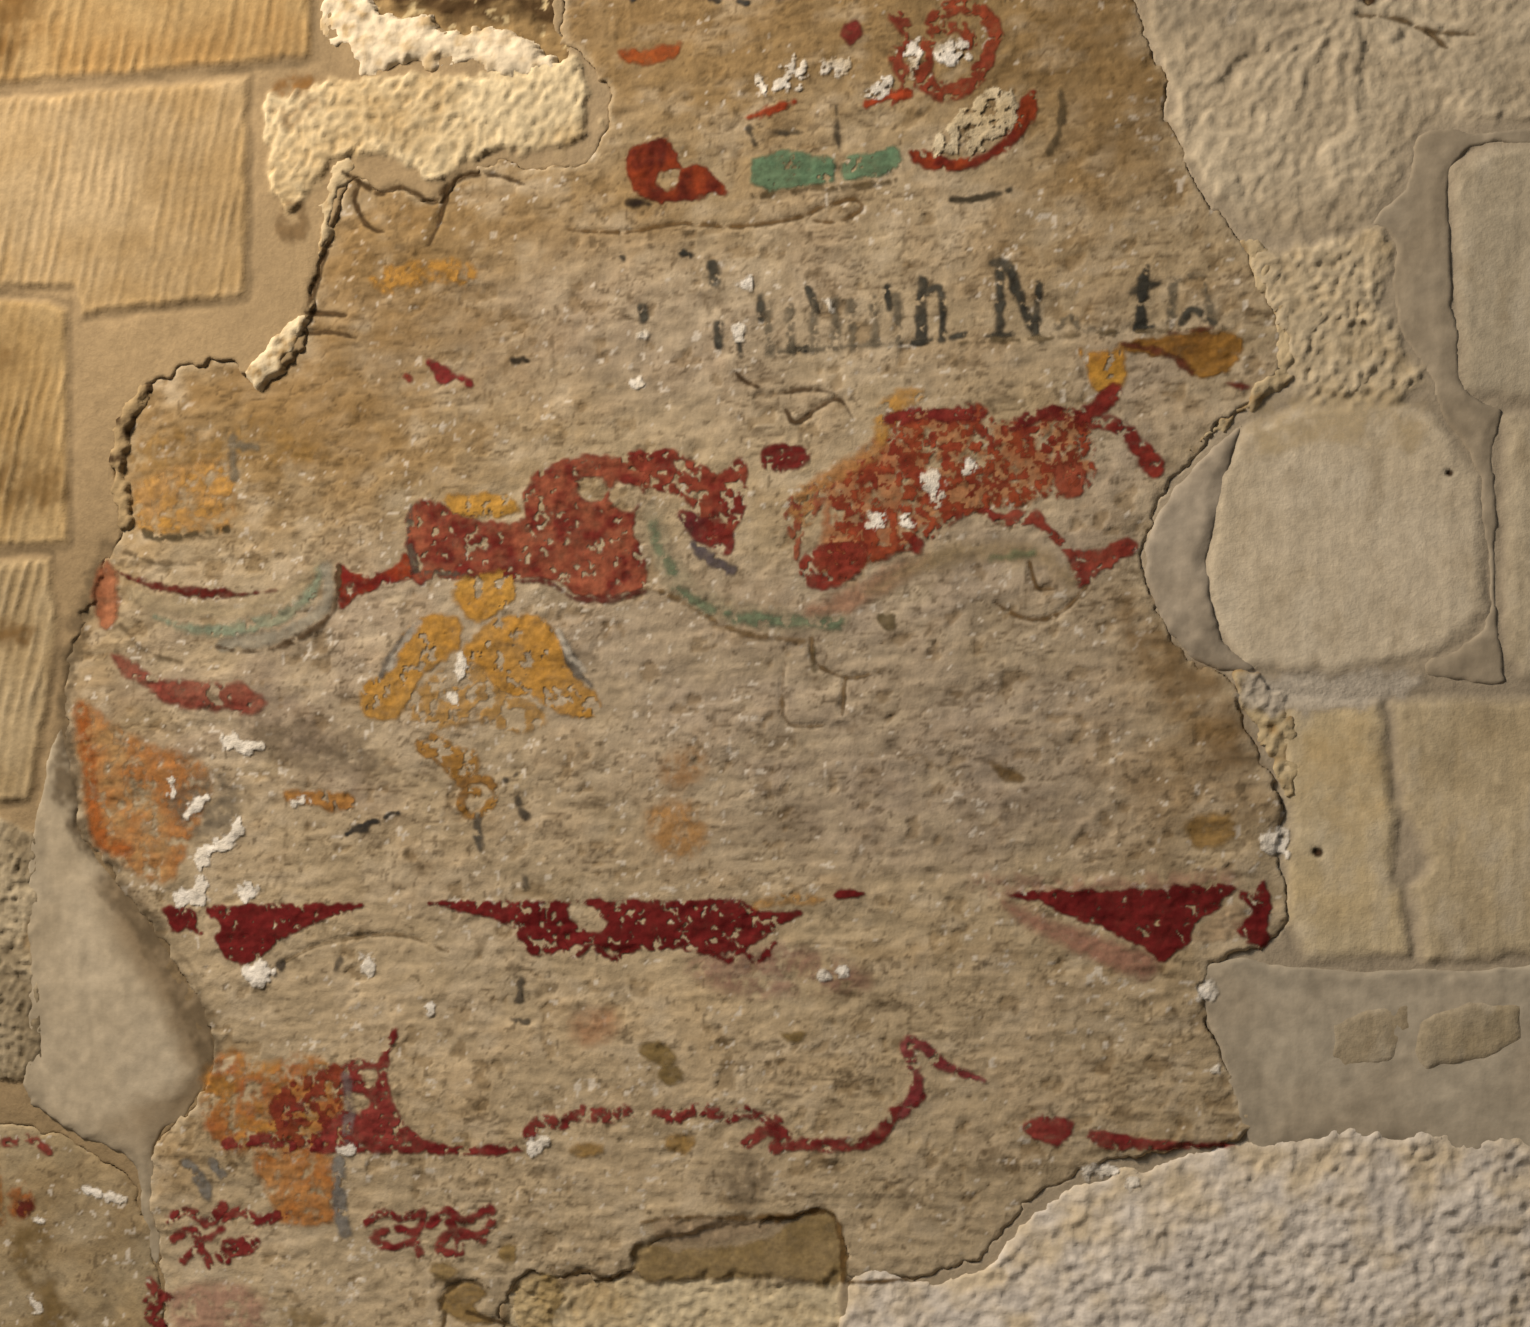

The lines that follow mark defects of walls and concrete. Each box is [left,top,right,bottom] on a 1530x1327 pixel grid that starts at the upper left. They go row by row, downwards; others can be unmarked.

crack [342,171,519,245]
crack [302,244,351,337]
spalling [1240,239,1276,293]
spalling [1189,305,1295,451]
spalling [1232,669,1298,797]
flaking render [1259,826,1290,859]
flaking render [499,1244,515,1261]
flaking render [631,1207,847,1286]
flaking render [430,1263,493,1323]
flaking render [514,1273,564,1327]